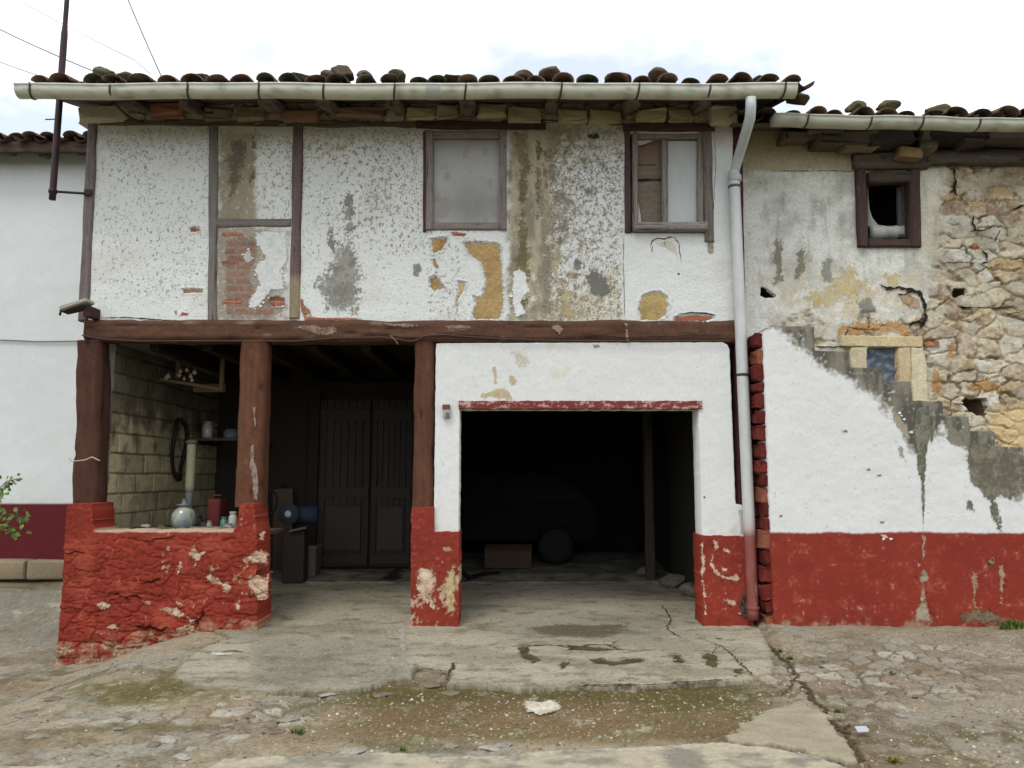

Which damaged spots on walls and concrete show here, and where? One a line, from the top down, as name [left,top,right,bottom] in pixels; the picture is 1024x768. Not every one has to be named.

damp [513,132,552,283]
peeling [222,230,289,309]
damp [313,190,363,315]
spalling [428,231,529,320]
damp [573,259,611,296]
damp [773,238,806,285]
crack [880,284,936,364]
crack [113,578,160,600]
crack [136,607,204,632]
peeling [176,531,273,610]
peeling [413,546,460,618]
crack [560,606,871,768]